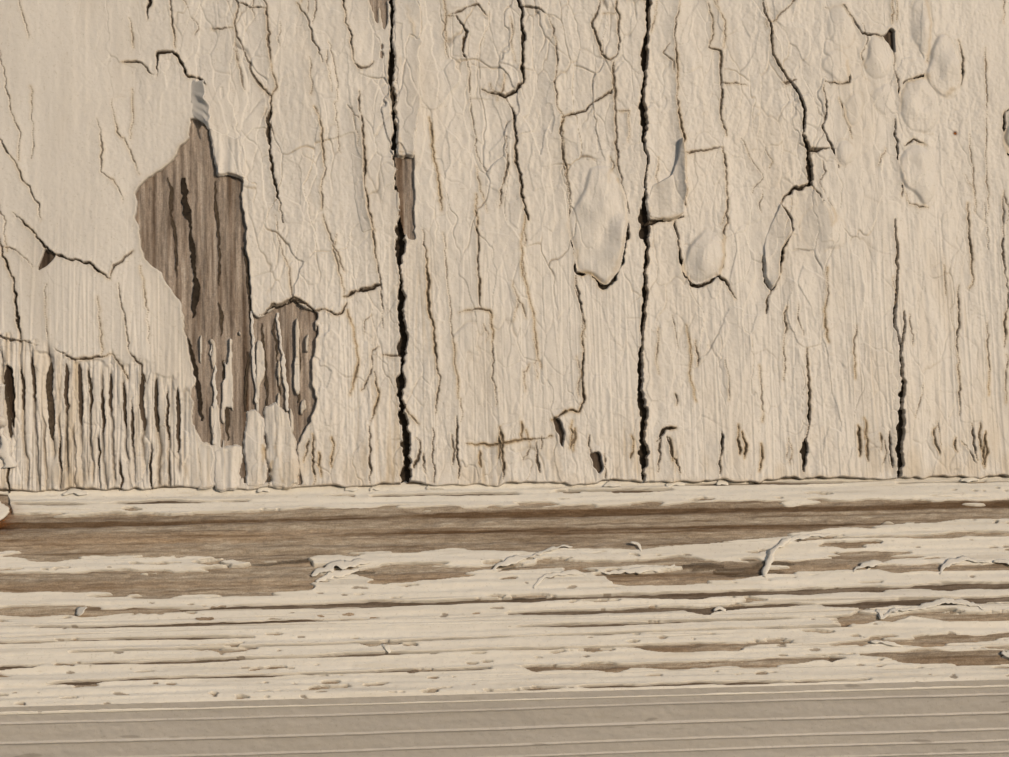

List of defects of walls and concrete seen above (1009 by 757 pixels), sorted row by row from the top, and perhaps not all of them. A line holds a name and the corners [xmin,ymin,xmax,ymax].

peeling [39,250,55,270]
peeling [136,80,318,492]
crack [234,24,278,199]
crack [358,0,398,192]
peeling [369,0,422,240]
crack [264,98,540,483]
crack [497,0,729,480]
peeling [645,138,688,221]
crack [759,9,850,325]
crack [857,254,912,477]
peeling [0,357,1009,688]
peeling [367,662,489,693]